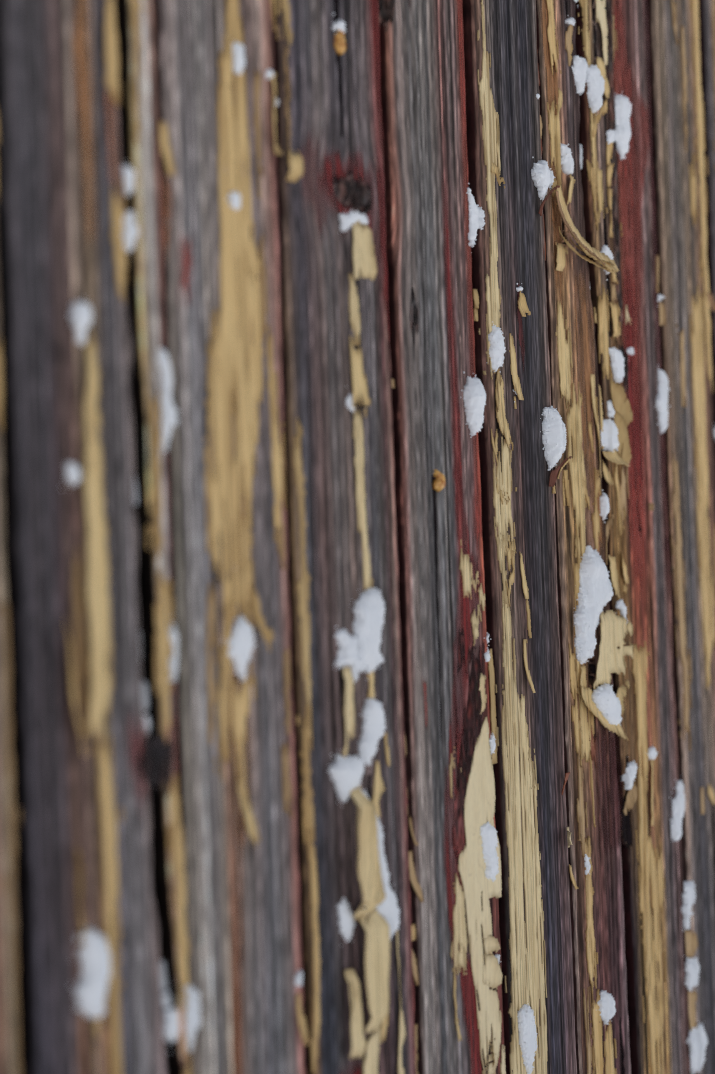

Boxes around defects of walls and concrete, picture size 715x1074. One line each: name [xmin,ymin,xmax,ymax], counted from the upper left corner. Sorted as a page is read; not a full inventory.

peeling [537,0,623,272]
peeling [204,0,321,1074]
peeling [342,666,355,758]
peeling [349,220,377,591]
peeling [367,671,375,699]
peeling [344,732,419,1074]
peeling [407,793,424,903]
peeling [449,0,548,1074]
peeling [549,272,667,1074]
peeling [685,930,698,958]
peeling [688,990,697,1031]
peeling [700,784,715,815]